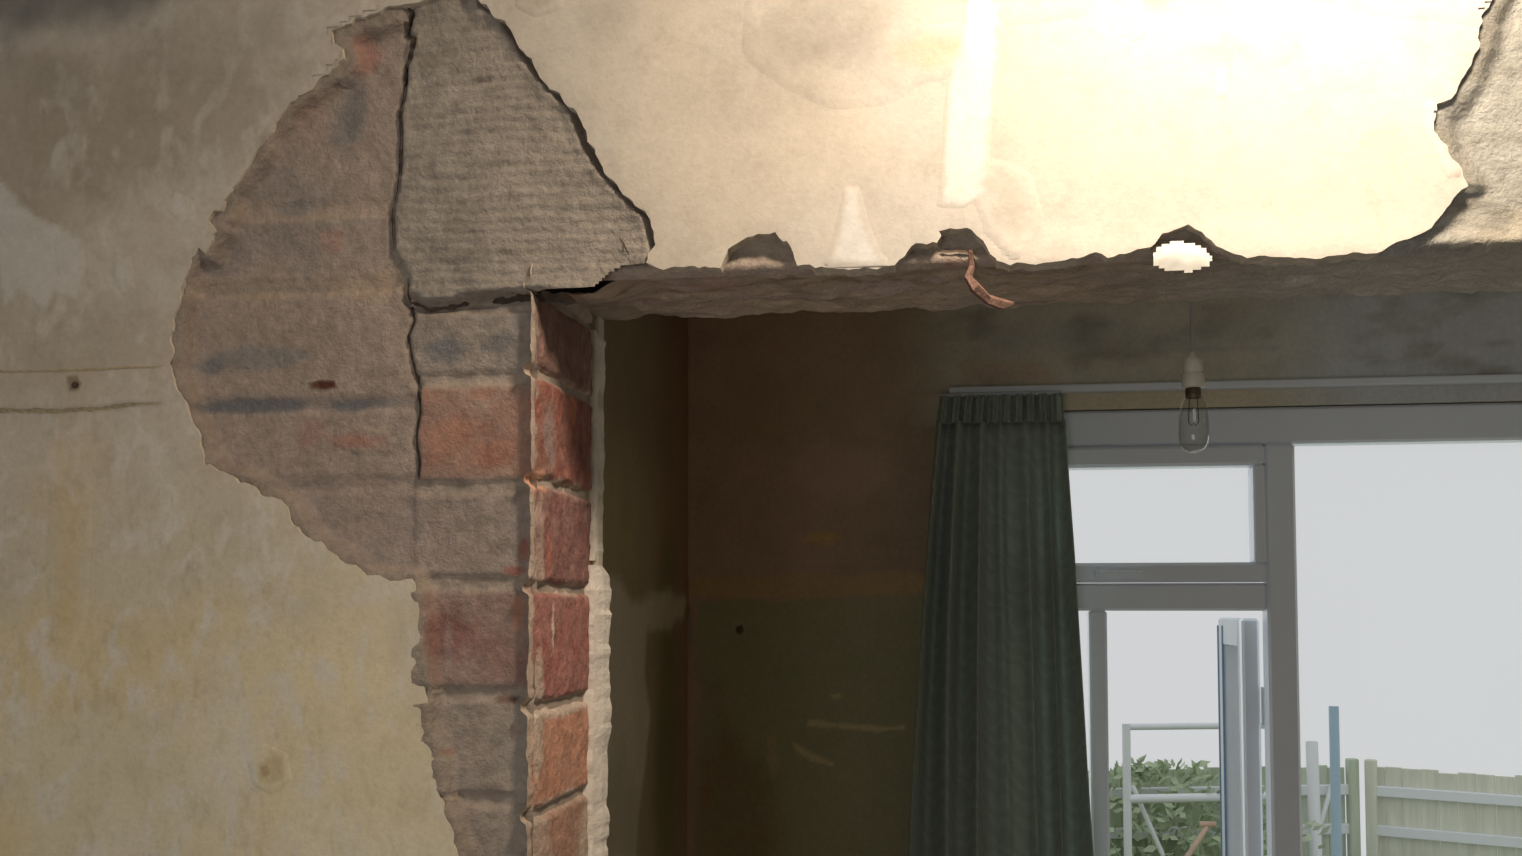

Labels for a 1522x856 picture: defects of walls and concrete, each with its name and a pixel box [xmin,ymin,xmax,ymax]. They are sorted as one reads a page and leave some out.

damp [0,0,382,152]
crack [391,8,415,247]
spalling [567,0,1522,320]
flaking render [170,0,655,856]
crack [407,284,576,479]